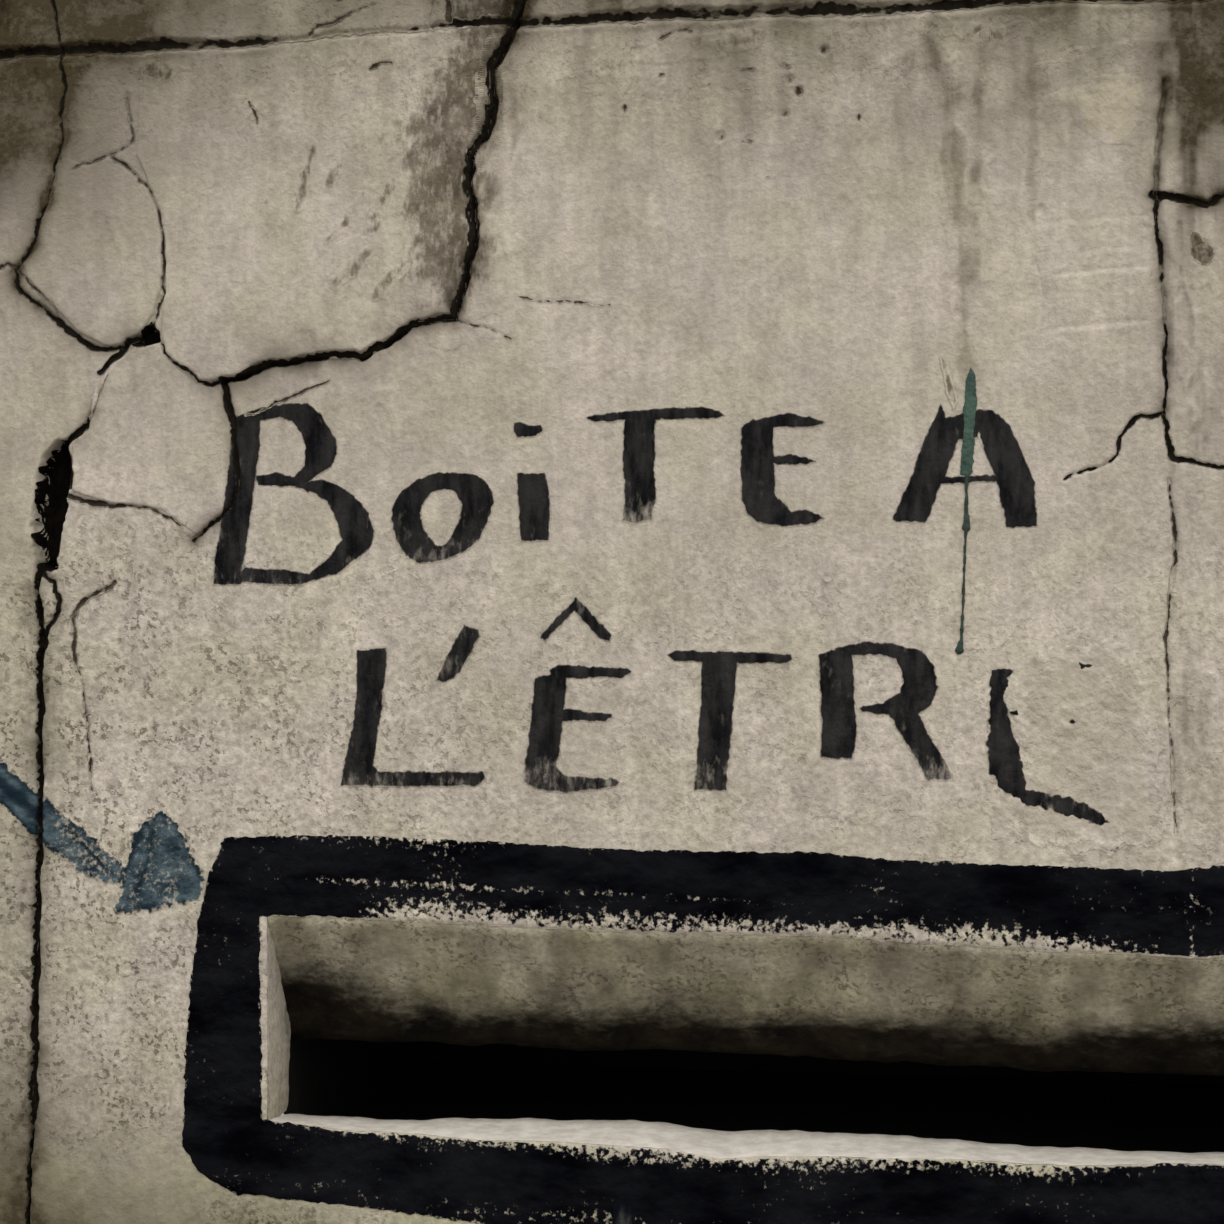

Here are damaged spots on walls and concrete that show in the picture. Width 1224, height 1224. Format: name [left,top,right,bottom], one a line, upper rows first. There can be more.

crack [0,0,527,542]
damp [293,0,559,352]
crack [515,295,611,307]
crack [1063,79,1224,835]
crack [25,562,117,1224]